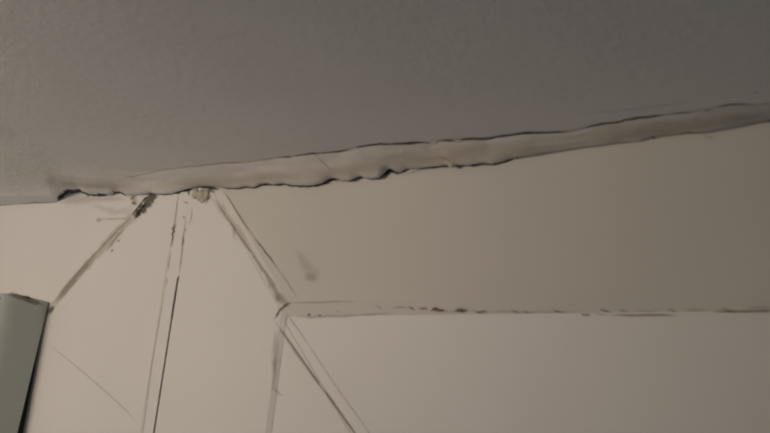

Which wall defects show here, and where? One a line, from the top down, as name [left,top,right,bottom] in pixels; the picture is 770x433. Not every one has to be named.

crack [589,115,658,127]
crack [442,131,562,142]
crack [286,142,423,158]
crack [225,158,518,189]